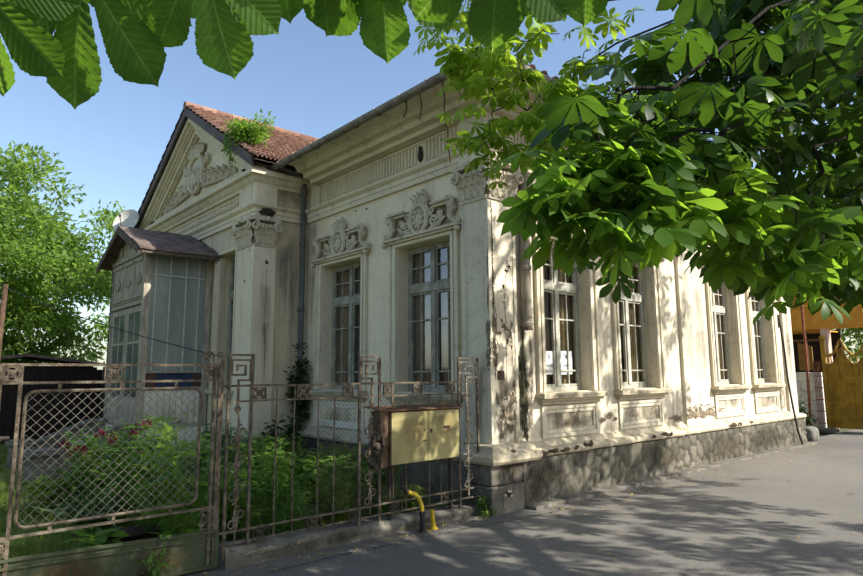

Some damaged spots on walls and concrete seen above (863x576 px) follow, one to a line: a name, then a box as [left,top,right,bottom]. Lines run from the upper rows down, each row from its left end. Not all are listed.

crack [490,200,517,407]
spalling [496,380,517,443]
leakage [520,349,529,423]